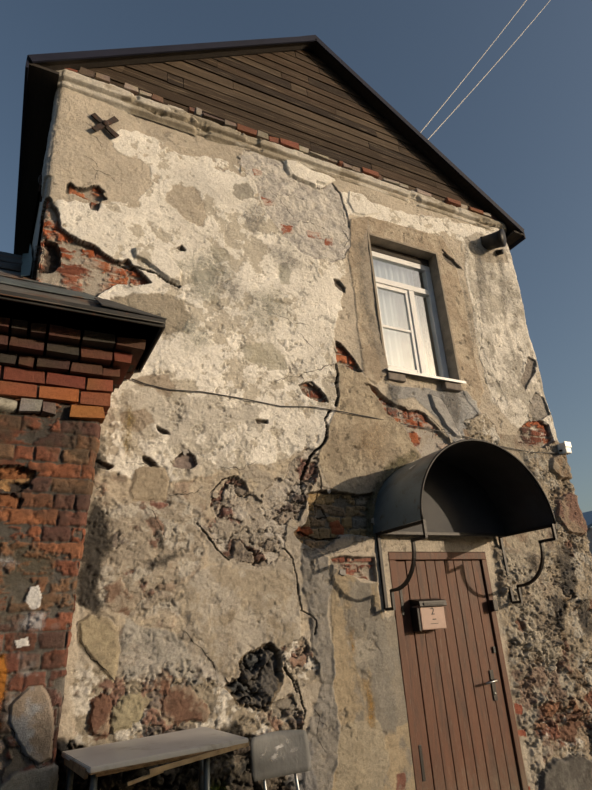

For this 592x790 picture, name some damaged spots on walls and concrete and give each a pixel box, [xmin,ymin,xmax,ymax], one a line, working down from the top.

spalling [66,181,107,211]
spalling [32,196,152,299]
damp [94,450,102,474]
spalling [299,381,329,403]
crack [276,363,363,553]
spalling [335,340,362,372]
spalling [364,383,500,457]
spalling [516,356,554,451]
damp [75,503,113,616]
spalling [207,446,378,582]
crack [283,547,318,635]
spalling [225,636,320,730]